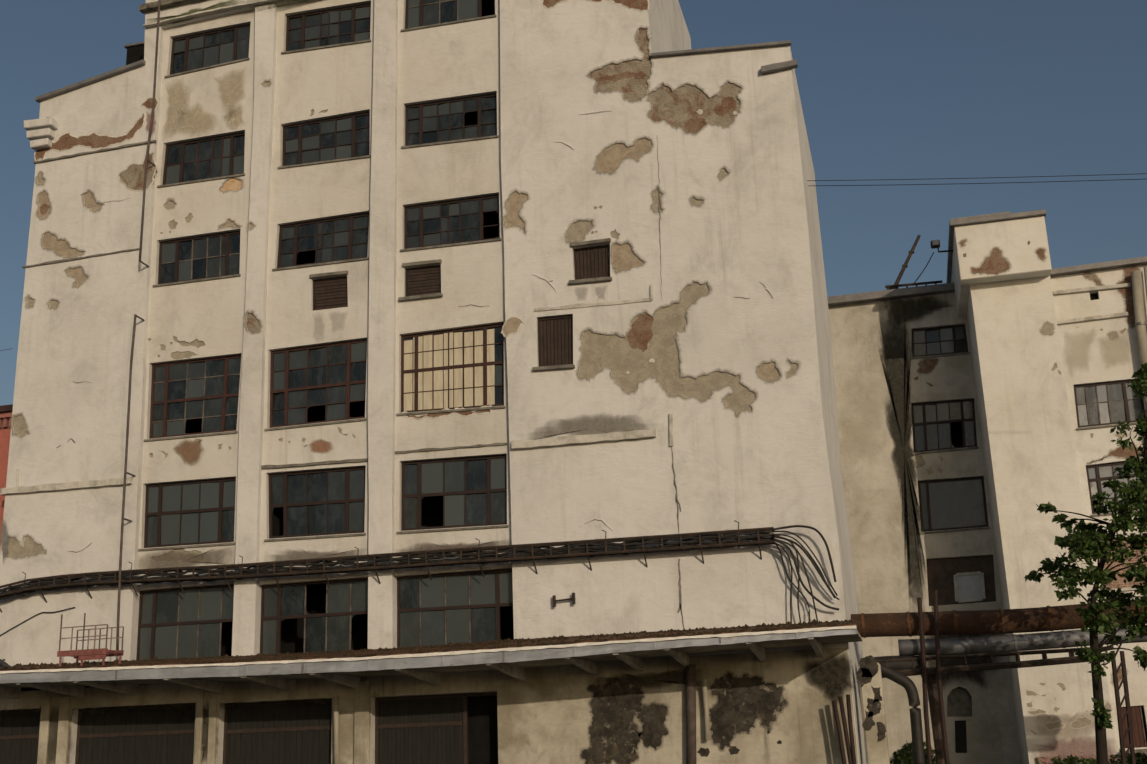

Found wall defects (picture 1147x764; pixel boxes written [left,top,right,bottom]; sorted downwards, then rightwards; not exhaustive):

flaking render [541,0,569,10]
flaking render [586,0,650,12]
flaking render [588,27,742,134]
flaking render [594,137,653,175]
flaking render [34,96,159,287]
flaking render [504,190,529,234]
flaking render [960,239,1010,275]
flaking render [577,281,757,417]
flaking render [756,360,799,382]
flaking render [6,535,46,559]
crack [671,447,685,629]
water stain [598,670,686,689]